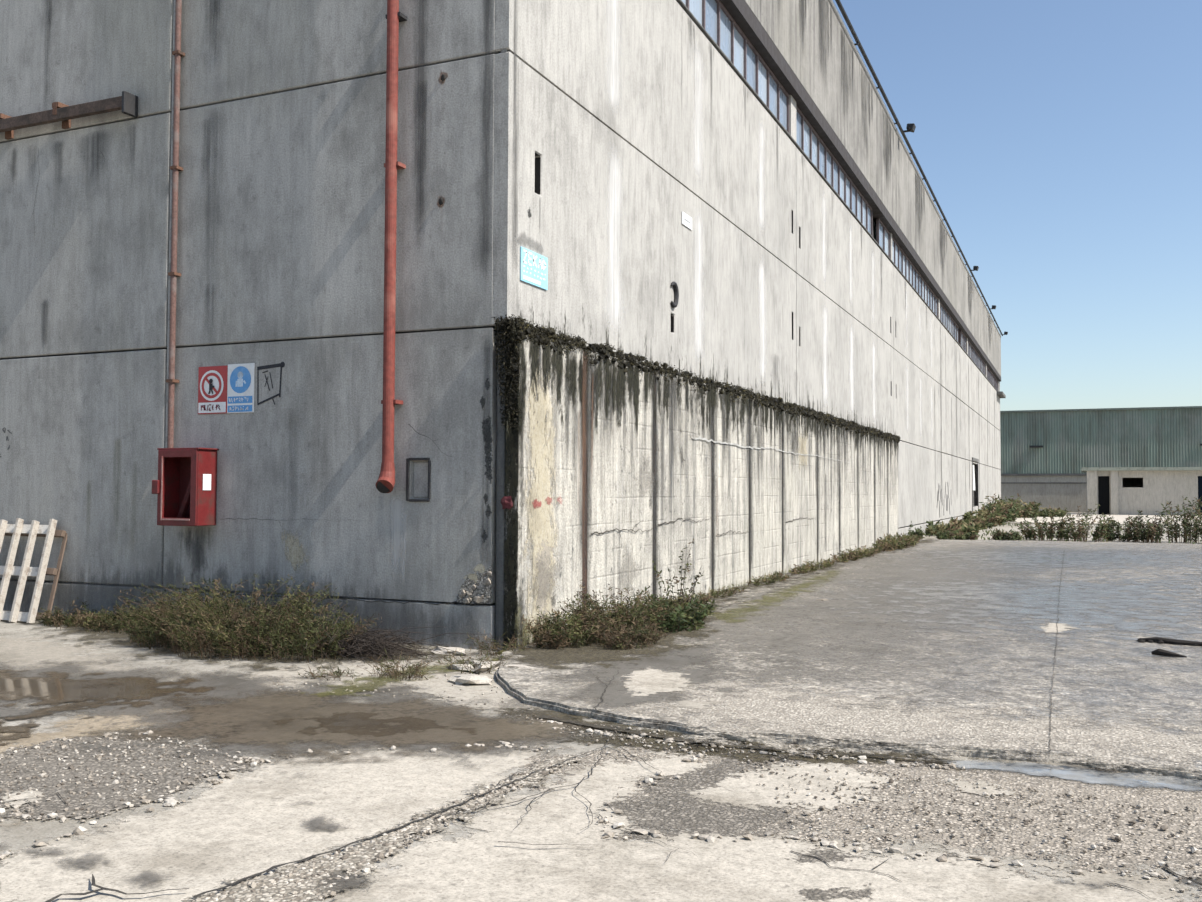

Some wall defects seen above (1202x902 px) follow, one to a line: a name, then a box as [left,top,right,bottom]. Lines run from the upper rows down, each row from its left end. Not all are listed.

damp [524,344,570,631]
damp [653,379,677,579]
damp [711,397,762,542]
damp [782,413,848,546]
spalling [457,564,492,604]
spalling [0,748,313,851]
crack [45,661,956,902]
spalling [465,741,556,754]
spalling [589,793,669,840]
spalling [531,719,965,788]
spalling [691,832,947,861]
spalling [1053,865,1160,882]